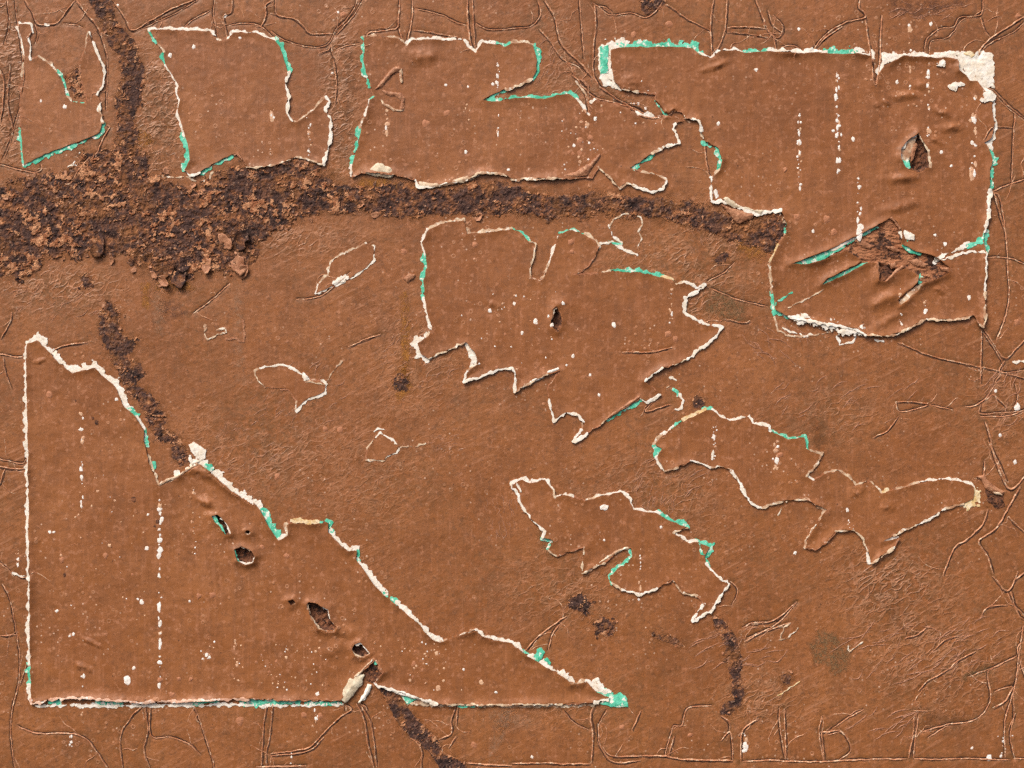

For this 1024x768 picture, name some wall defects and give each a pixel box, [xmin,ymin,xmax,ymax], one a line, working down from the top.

peeling [148,26,333,182]
rust [0,0,787,309]
crack [0,0,887,185]
peeling [349,33,999,345]
crack [923,0,1024,55]
rust [97,299,190,467]
peeling [404,213,1005,564]
crack [412,86,1024,768]
peeling [22,332,628,709]
crack [251,703,383,768]
rust [379,688,468,768]
rust [712,615,745,716]